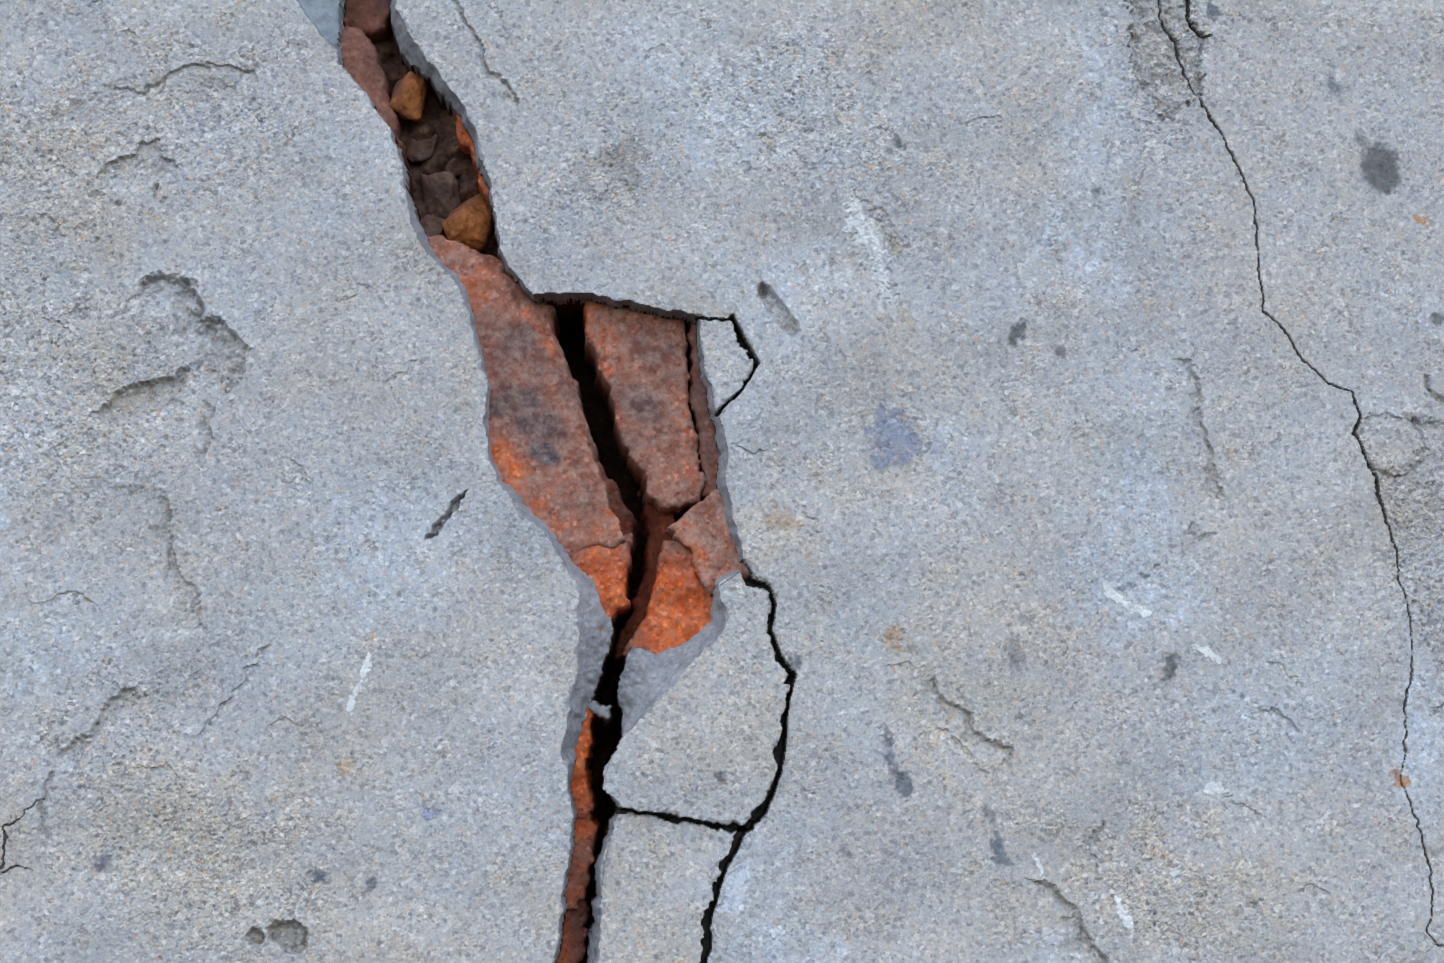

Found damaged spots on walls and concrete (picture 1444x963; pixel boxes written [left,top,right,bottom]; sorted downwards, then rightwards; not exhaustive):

crack [296,0,796,963]
peeling [716,856,755,915]
crack [1157,0,1444,947]